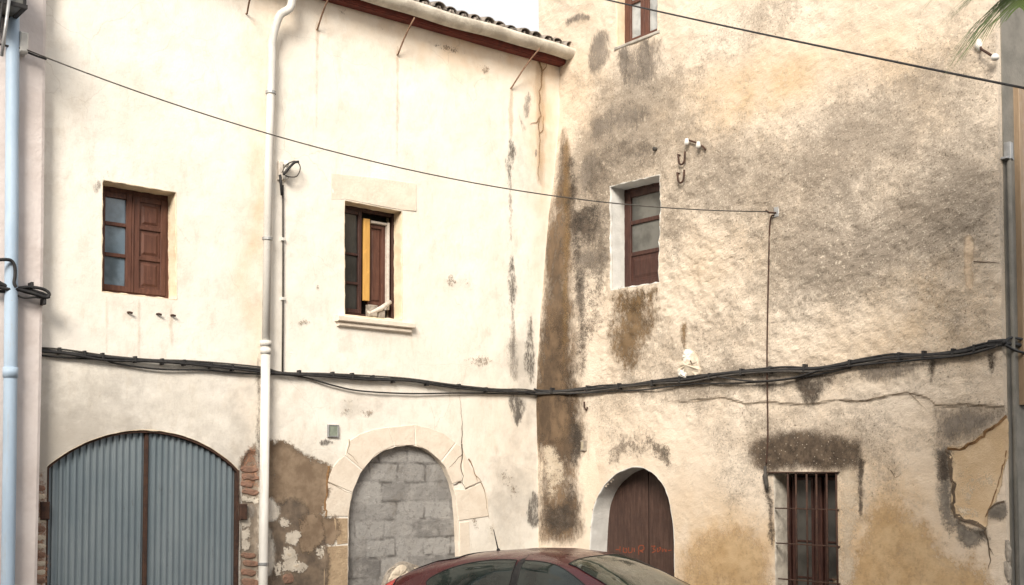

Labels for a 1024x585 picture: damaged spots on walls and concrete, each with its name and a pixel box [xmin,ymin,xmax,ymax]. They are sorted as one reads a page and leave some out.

leakage [588,31,658,83]
crack [531,62,547,176]
leakage [508,101,659,541]
flaking render [239,440,341,585]
crack [453,397,489,516]
leakage [608,434,669,466]
crack [692,392,1005,412]
leakage [749,410,993,585]
flaking render [945,415,1009,531]